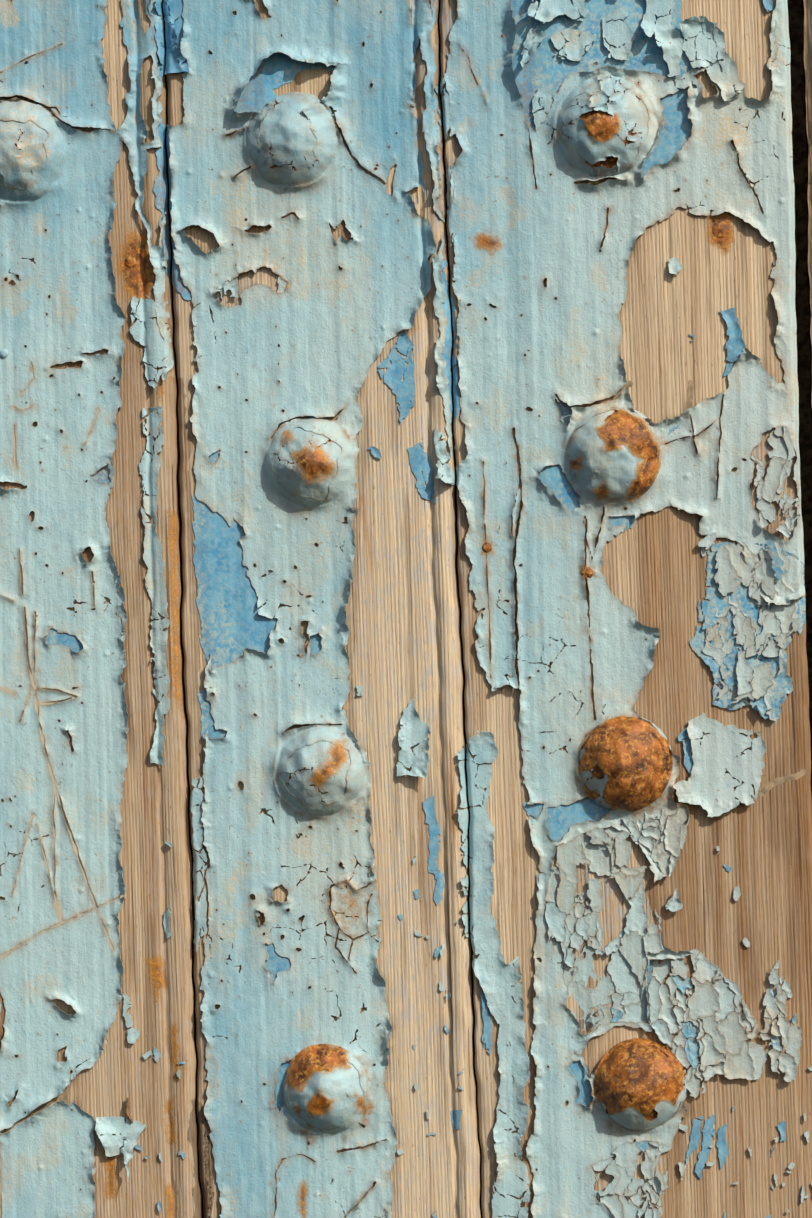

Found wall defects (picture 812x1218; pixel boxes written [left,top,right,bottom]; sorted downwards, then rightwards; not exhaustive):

peeling [234,52,336,113]
corrosion [119,233,155,304]
spalling [50,349,109,369]
corrosion [283,431,335,484]
corrosion [594,409,661,502]
peeling [64,0,292,1218]
spalling [301,620,323,655]
peeling [342,0,812,1218]
corrosion [579,716,673,812]
spalling [51,999,76,1015]
corrosion [287,1044,351,1116]
corrosion [594,1038,685,1115]